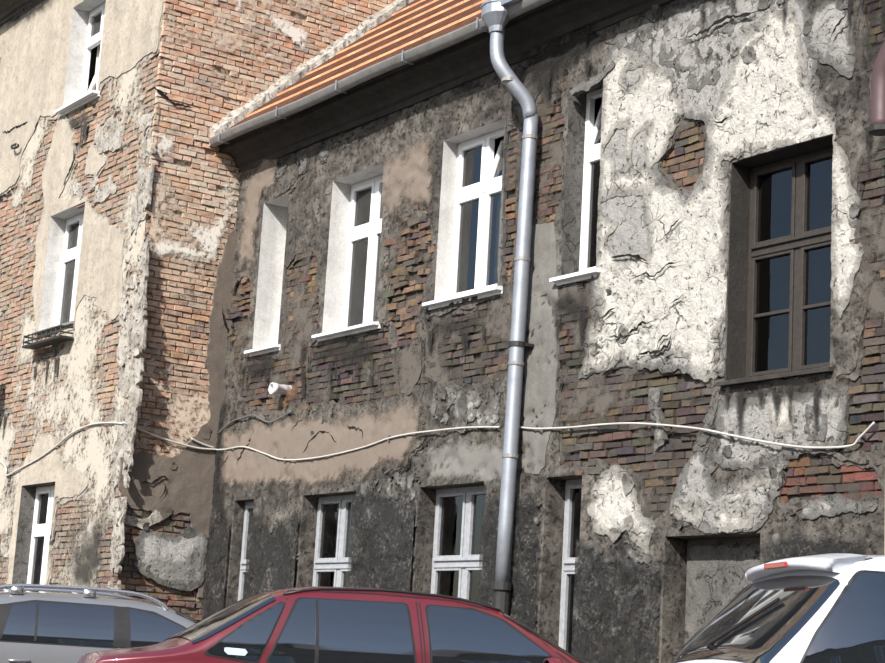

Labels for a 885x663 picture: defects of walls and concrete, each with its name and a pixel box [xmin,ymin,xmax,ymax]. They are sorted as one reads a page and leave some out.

crack [689,11,757,40]
crack [153,86,192,108]
crack [610,254,681,285]
spalling [0,1,518,598]
peeling [532,0,885,580]
crack [599,308,672,357]
crack [291,420,363,451]
crack [142,476,170,498]